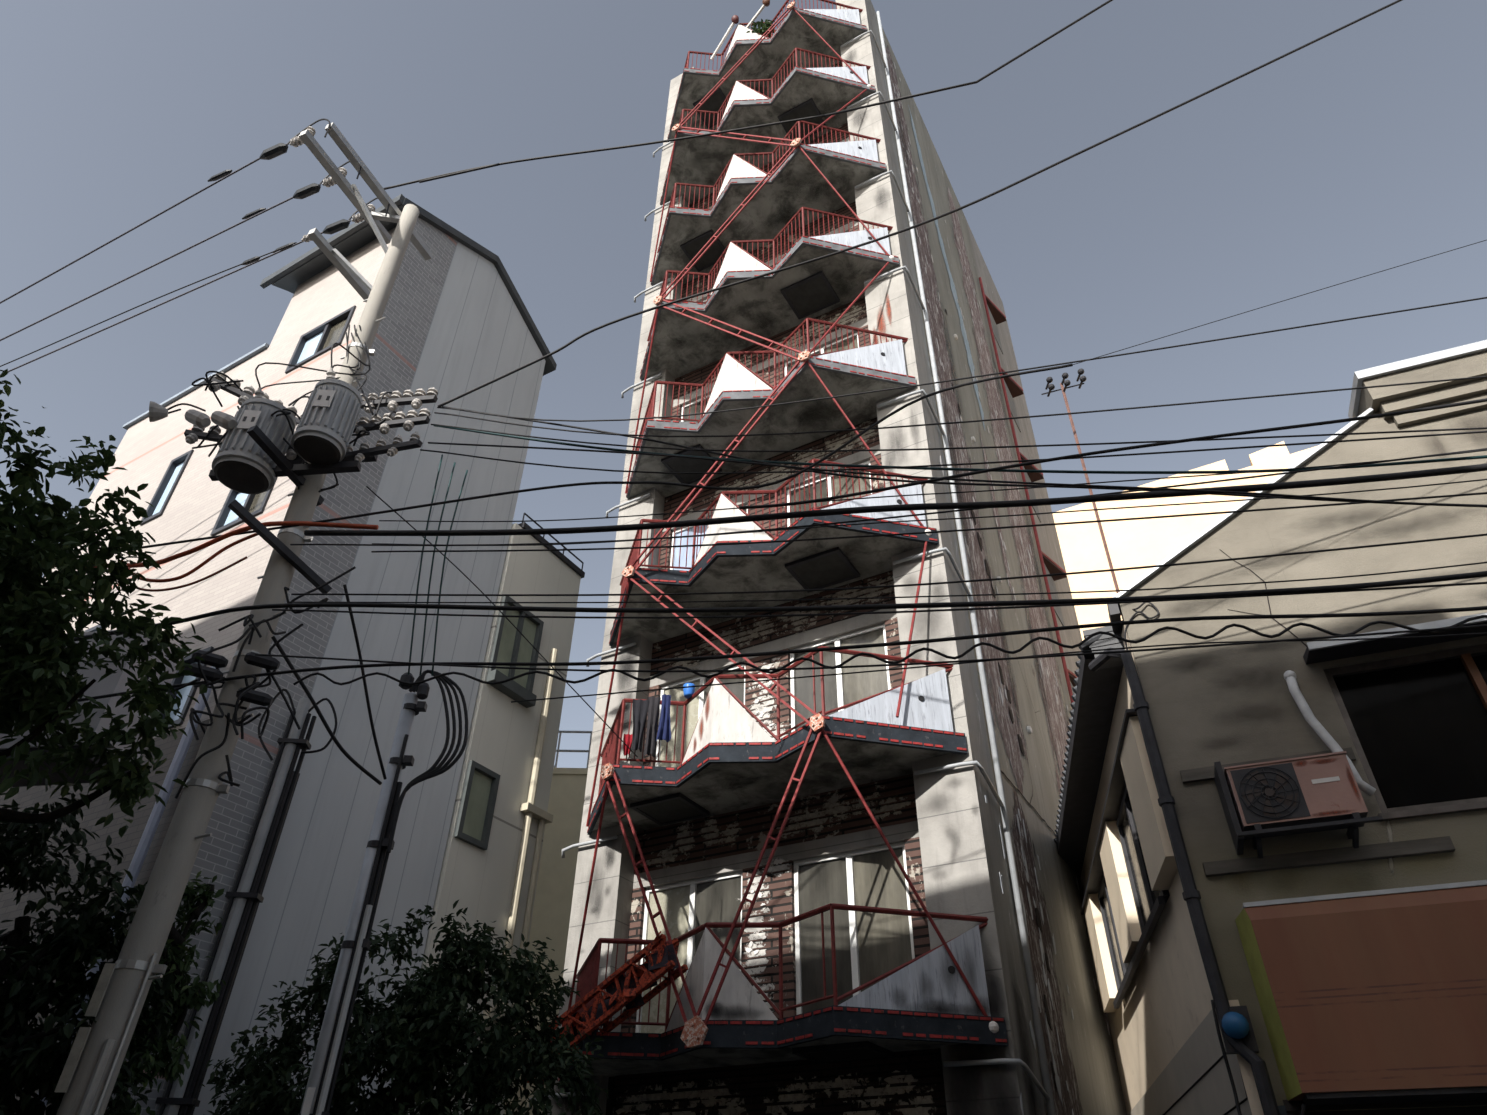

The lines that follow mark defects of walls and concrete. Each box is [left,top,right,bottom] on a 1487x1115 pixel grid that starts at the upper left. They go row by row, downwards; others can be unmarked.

rust [1296,759,1359,816]
peeling [640,814,742,867]
peeling [776,792,915,839]
peeling [737,855,790,1012]
peeling [613,1070,936,1115]